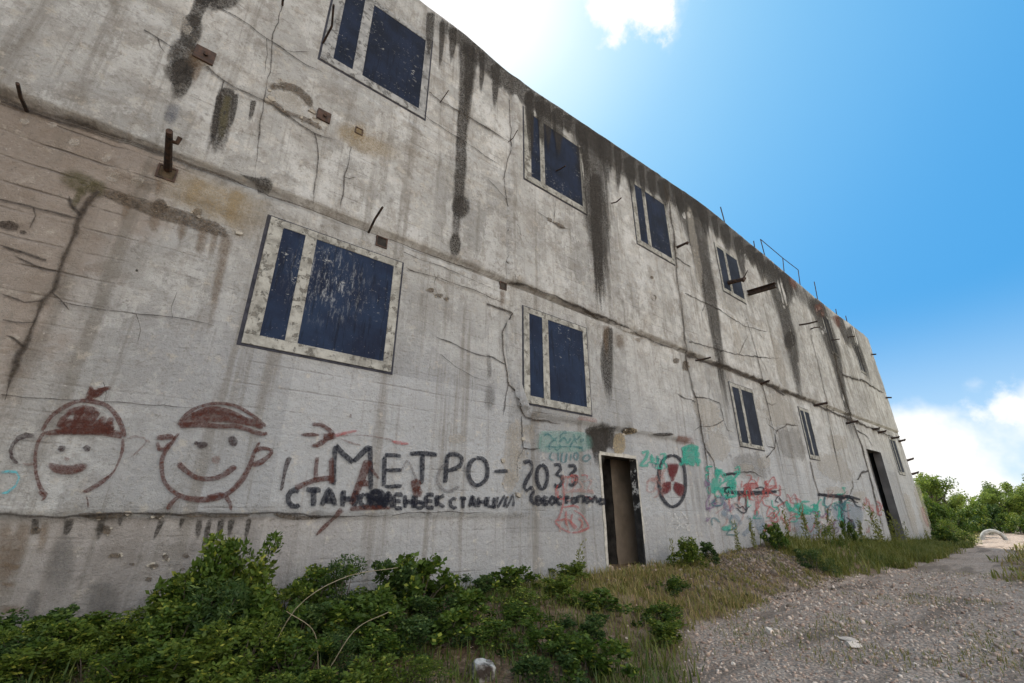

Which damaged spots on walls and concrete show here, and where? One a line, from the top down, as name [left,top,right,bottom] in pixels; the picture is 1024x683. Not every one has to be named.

damp [167,0,237,121]
damp [210,88,256,149]
crack [0,3,893,539]
damp [426,13,869,421]
damp [53,520,74,579]
damp [179,519,251,537]